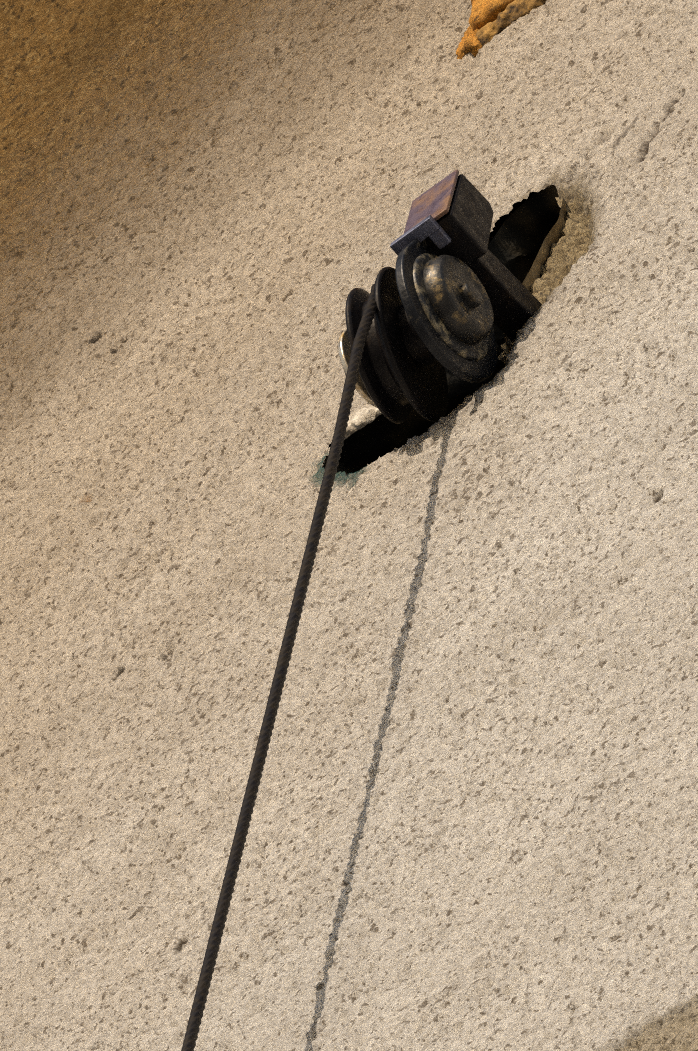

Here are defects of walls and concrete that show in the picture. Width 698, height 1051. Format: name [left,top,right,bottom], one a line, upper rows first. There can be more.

spalling [322,184,593,476]